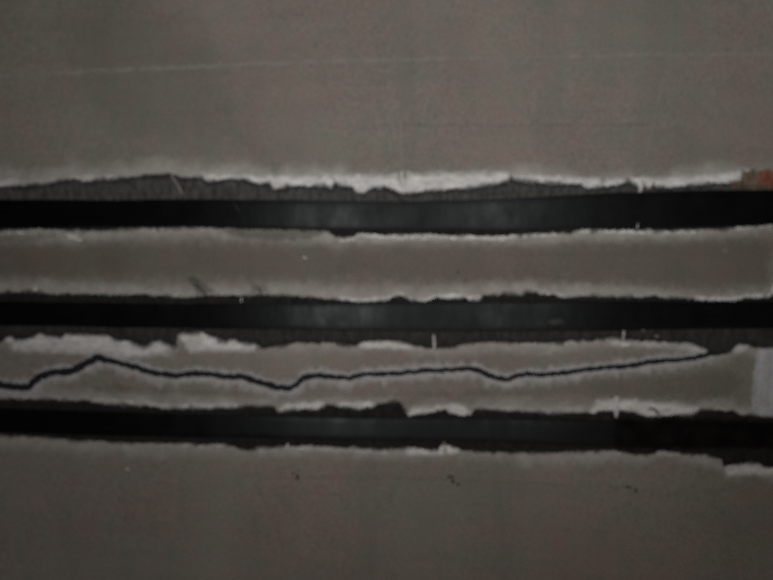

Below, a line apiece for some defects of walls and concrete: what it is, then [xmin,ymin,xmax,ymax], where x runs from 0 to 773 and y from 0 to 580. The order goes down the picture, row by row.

spalling [197,169,756,195]
rust [731,170,773,190]
spalling [338,232,565,242]
spalling [5,333,170,358]
spalling [180,332,260,353]
spalling [358,340,423,349]
spalling [521,337,708,354]
crack [0,350,726,398]
spalling [90,397,237,410]
spalling [408,403,471,417]
spalling [483,396,700,417]
spalling [403,445,460,455]